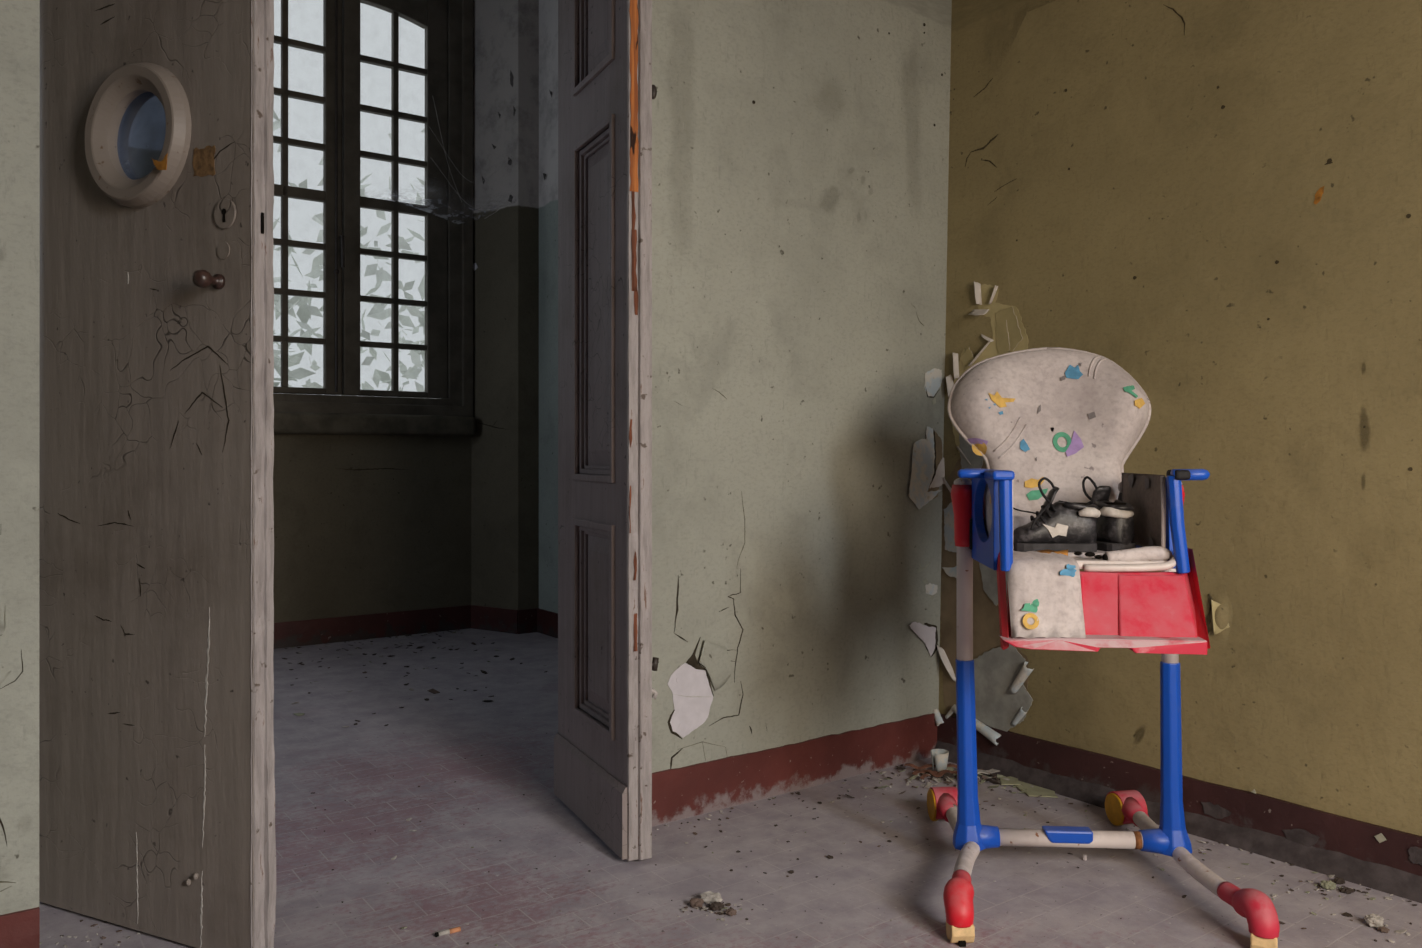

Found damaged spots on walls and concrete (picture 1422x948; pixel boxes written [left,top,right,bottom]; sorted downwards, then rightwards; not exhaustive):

peeling [924,281,1028,405]
crack [674,576,688,642]
crack [719,491,745,683]
peeling [908,422,1034,745]
peeling [667,638,743,769]
crack [678,723,767,761]